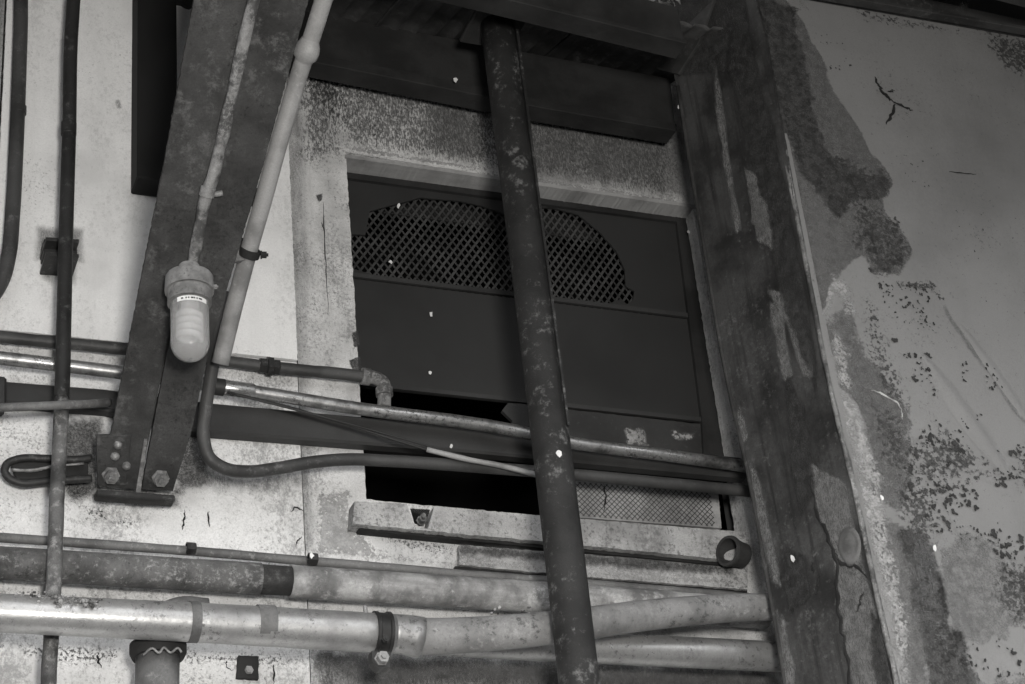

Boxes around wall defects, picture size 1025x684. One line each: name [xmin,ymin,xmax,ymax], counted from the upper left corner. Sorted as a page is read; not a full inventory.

leakage [301,78,342,156]
peeling [715,73,772,248]
peeling [806,193,855,316]
peeling [769,290,814,380]
peeling [811,334,908,684]
peeling [933,532,1025,644]